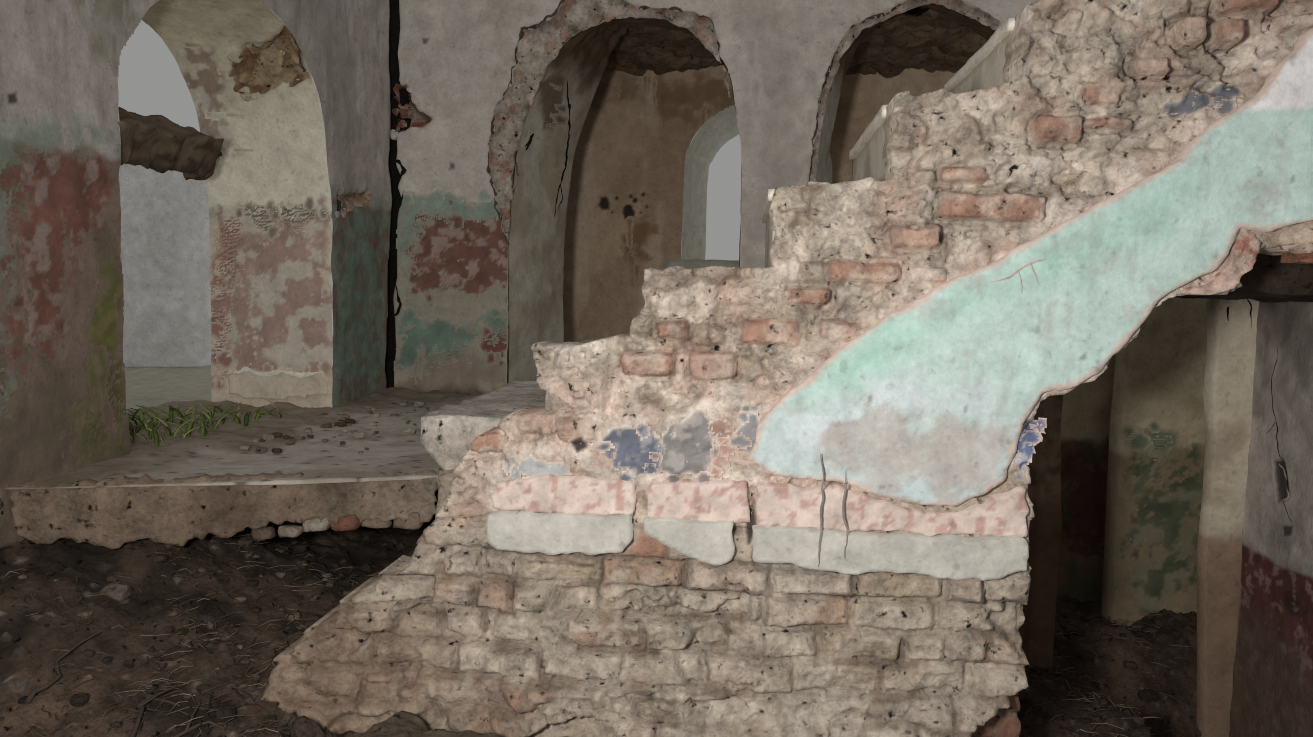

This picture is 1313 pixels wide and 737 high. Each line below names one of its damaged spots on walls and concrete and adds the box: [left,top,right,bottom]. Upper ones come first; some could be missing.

peeling [0,107,121,422]
crack [385,0,412,388]
peeling [209,0,736,403]
peeling [486,28,1313,581]
spalling [809,0,1000,182]
peeling [1061,420,1205,617]